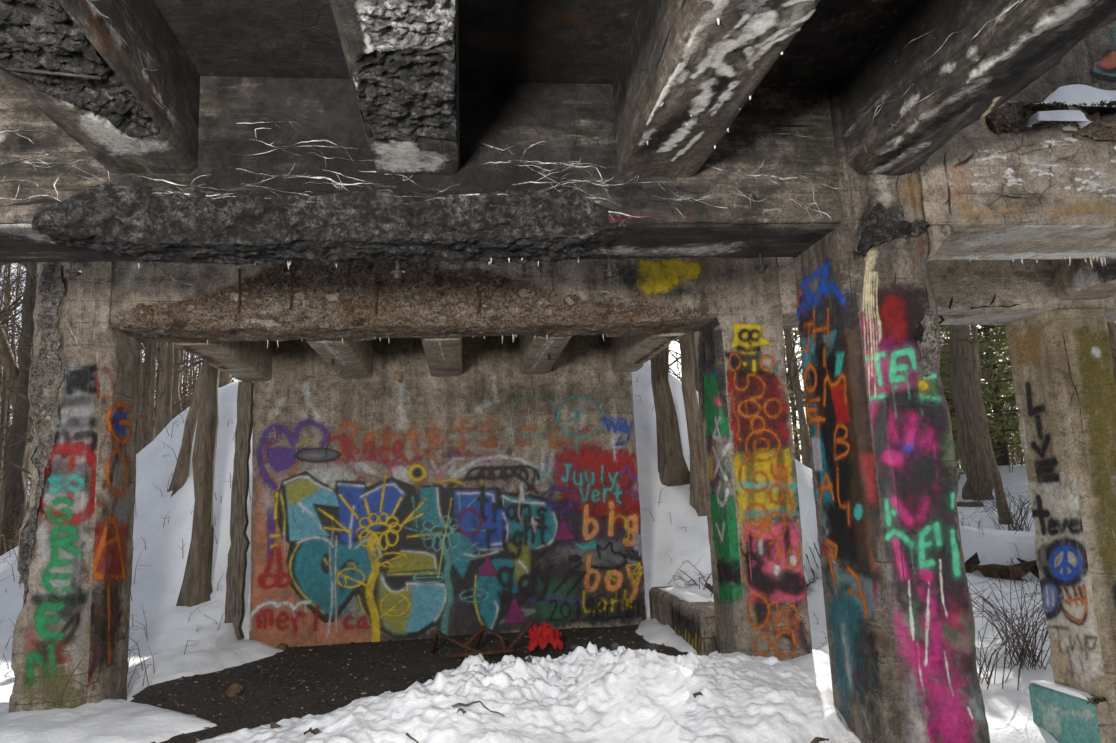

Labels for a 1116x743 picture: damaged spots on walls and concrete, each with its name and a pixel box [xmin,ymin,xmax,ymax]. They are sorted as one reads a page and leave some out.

spalling [0,0,158,138]
spalling [353,0,459,143]
water stain [633,0,816,161]
water stain [873,105,966,173]
water stain [971,0,1087,77]
spalling [987,103,1116,141]
spalling [32,182,701,343]
spalling [18,262,66,608]